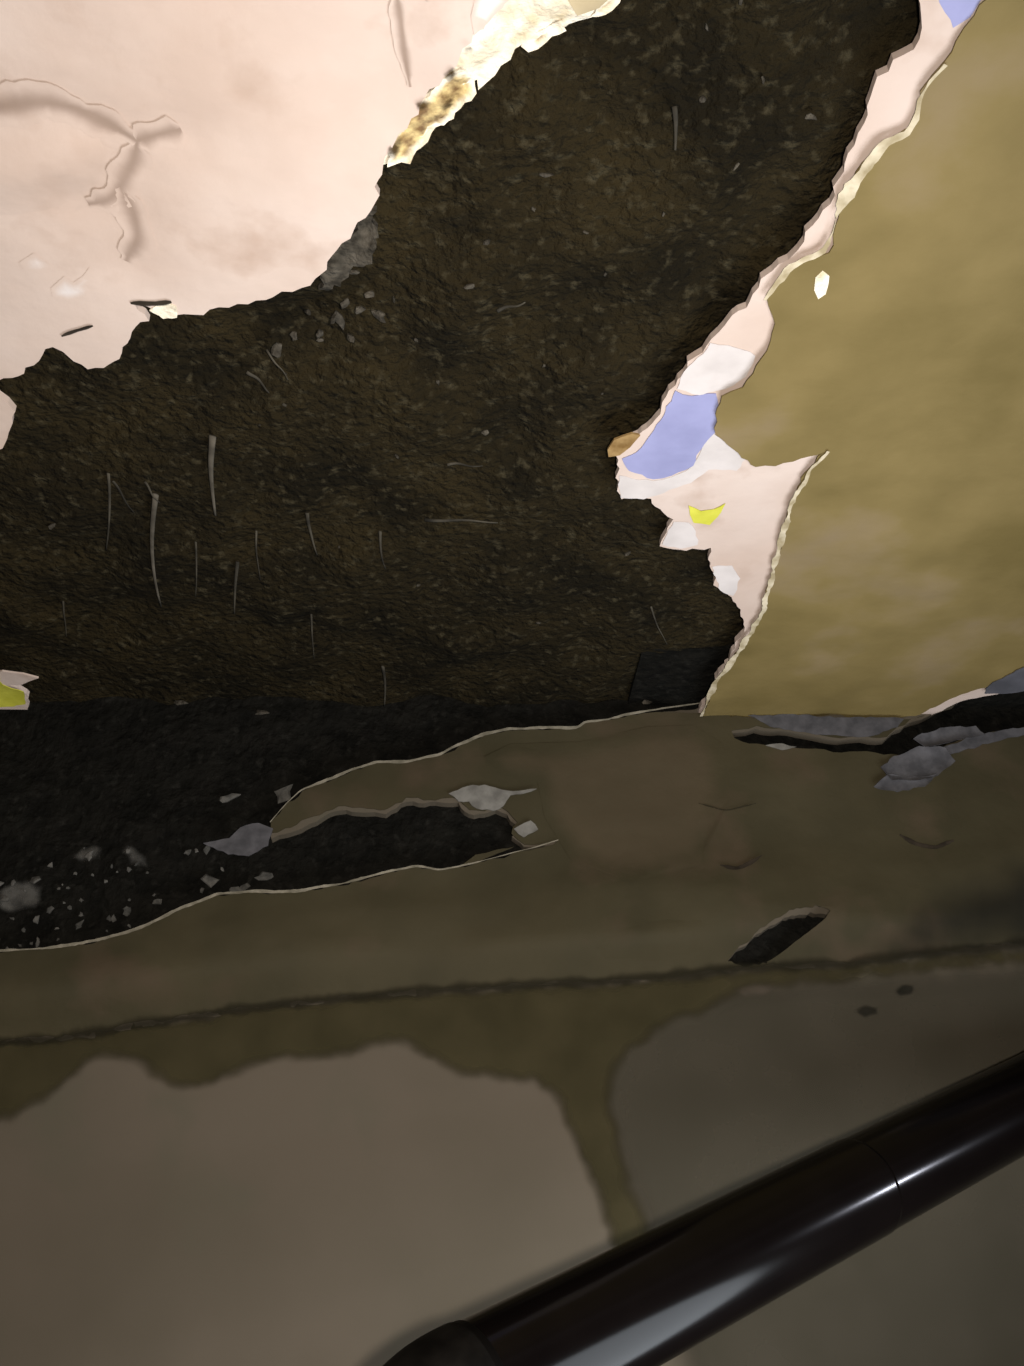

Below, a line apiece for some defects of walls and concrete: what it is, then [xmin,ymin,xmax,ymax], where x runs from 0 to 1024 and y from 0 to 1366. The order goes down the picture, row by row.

crack [388,0,431,87]
crack [0,80,185,264]
crack [130,299,172,307]
spalling [0,0,1024,1040]
crack [0,940,1024,1045]
leakage [0,951,1024,1246]
leakage [687,1157,1024,1366]